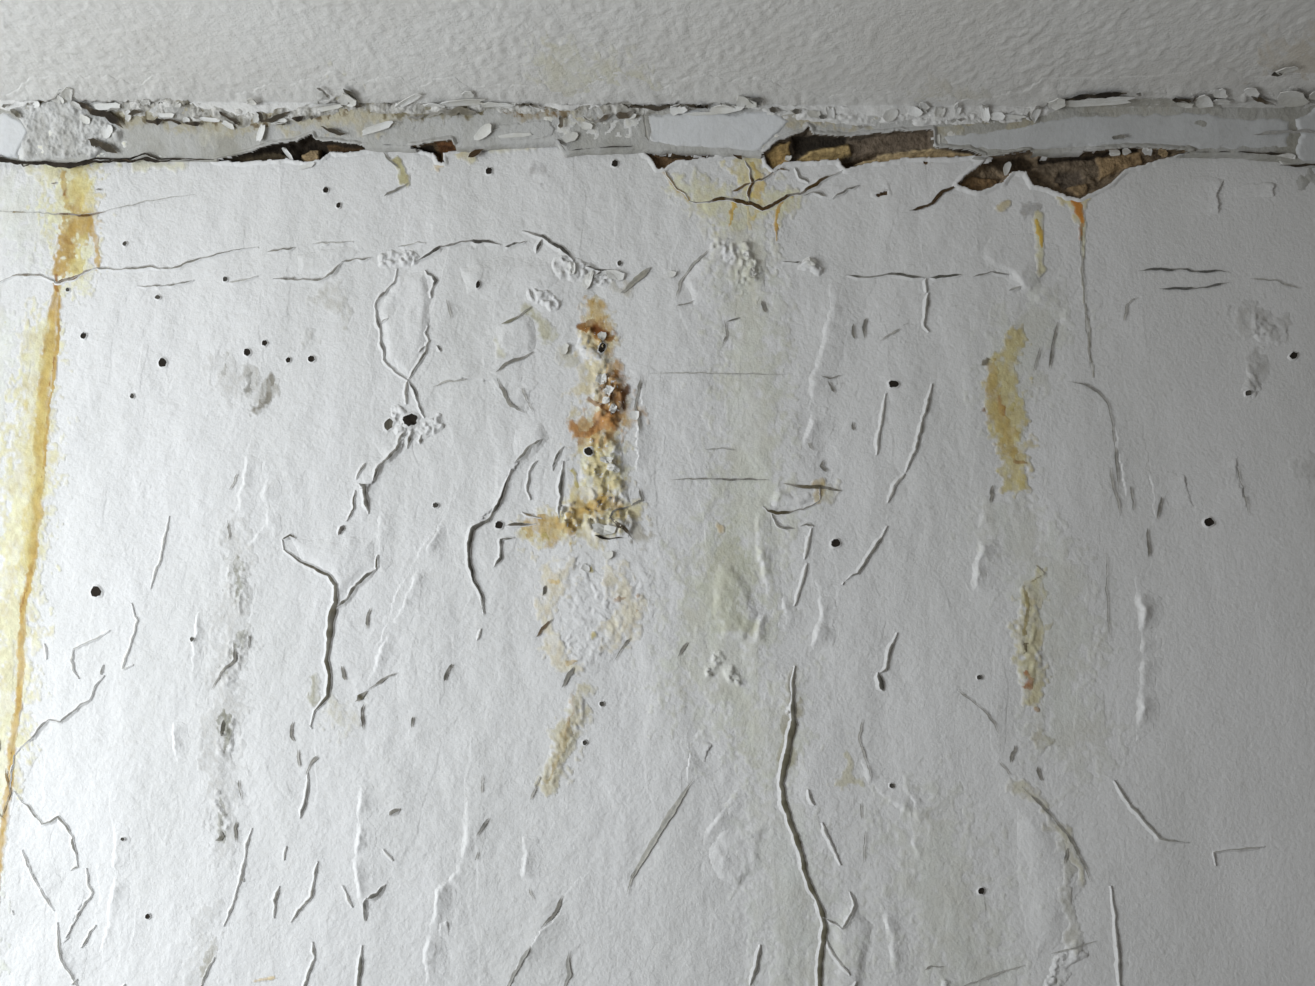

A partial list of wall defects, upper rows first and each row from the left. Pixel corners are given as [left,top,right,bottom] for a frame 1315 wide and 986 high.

leakage [0,147,57,447]
crack [0,516,170,986]
crack [0,230,651,540]
crack [271,533,396,986]
leakage [305,672,369,746]
spalling [377,249,420,269]
crack [464,439,564,641]
spalling [526,255,625,312]
peeling [0,92,1315,211]
crack [776,666,871,986]
leakage [620,247,1071,986]
leakage [944,467,1148,810]